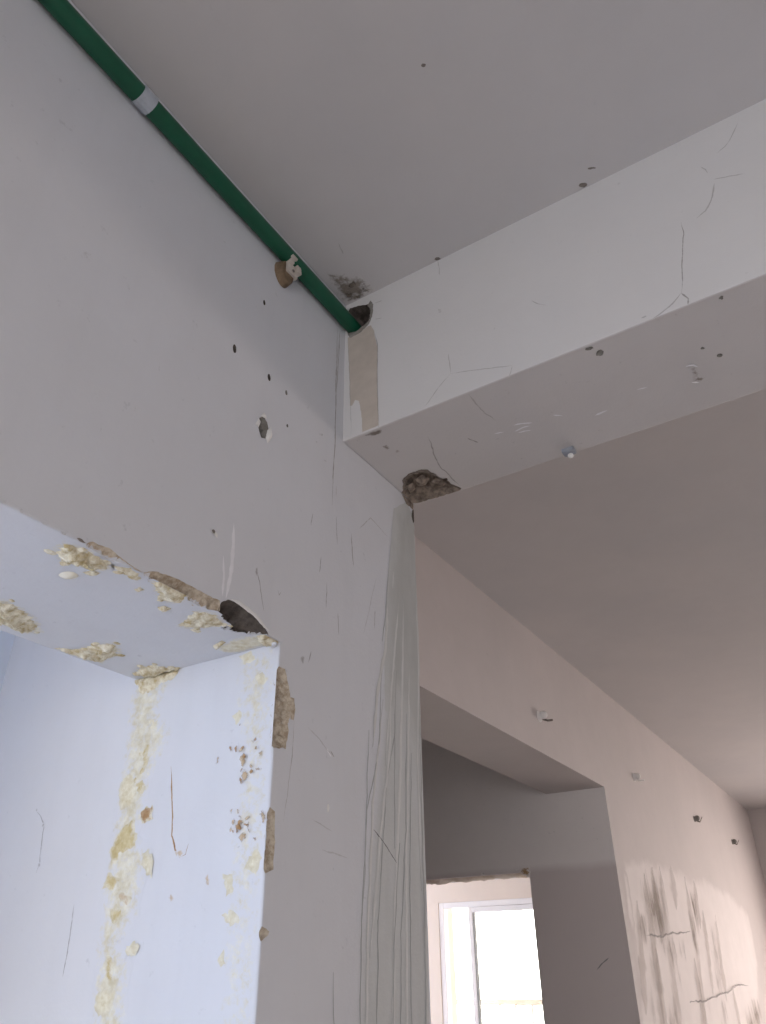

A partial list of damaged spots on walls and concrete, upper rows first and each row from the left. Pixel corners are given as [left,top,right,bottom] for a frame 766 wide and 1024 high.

spalling [60,530,269,634]